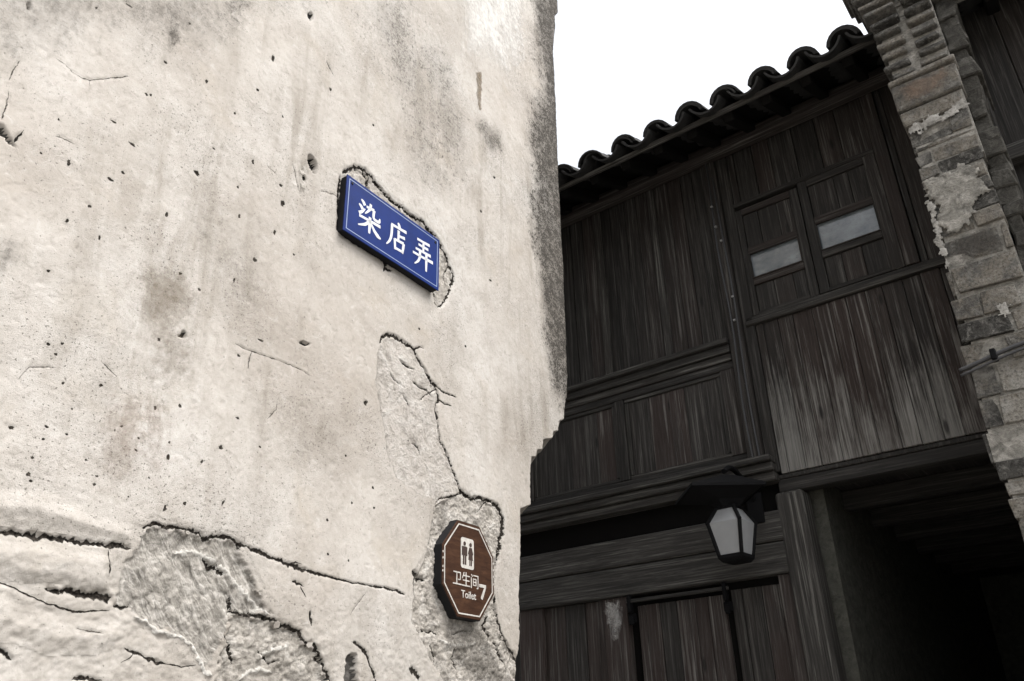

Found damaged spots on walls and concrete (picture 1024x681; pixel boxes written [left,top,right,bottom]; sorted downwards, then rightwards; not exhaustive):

flaking render [342,169,425,230]
damp [526,0,568,410]
flaking render [433,248,451,307]
peeling [364,337,516,681]
crack [0,529,130,633]
flaking render [113,505,330,681]
crack [237,542,424,626]